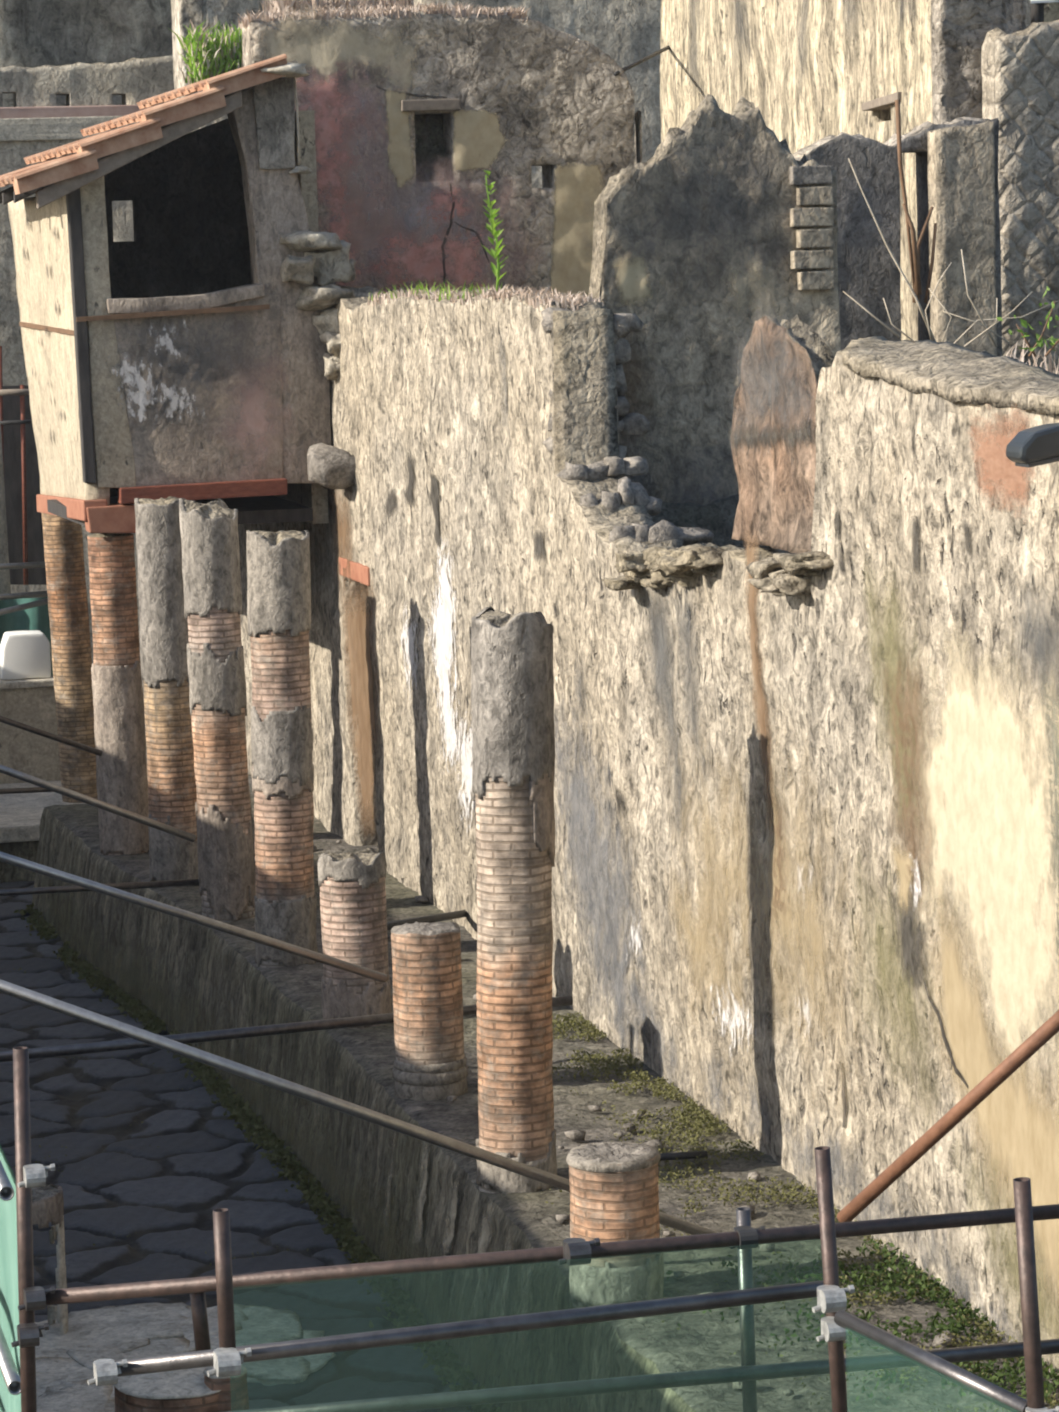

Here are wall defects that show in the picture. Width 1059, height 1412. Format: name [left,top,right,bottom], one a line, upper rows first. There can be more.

flaking render [112,320,205,422]
crack [923,978,969,1088]